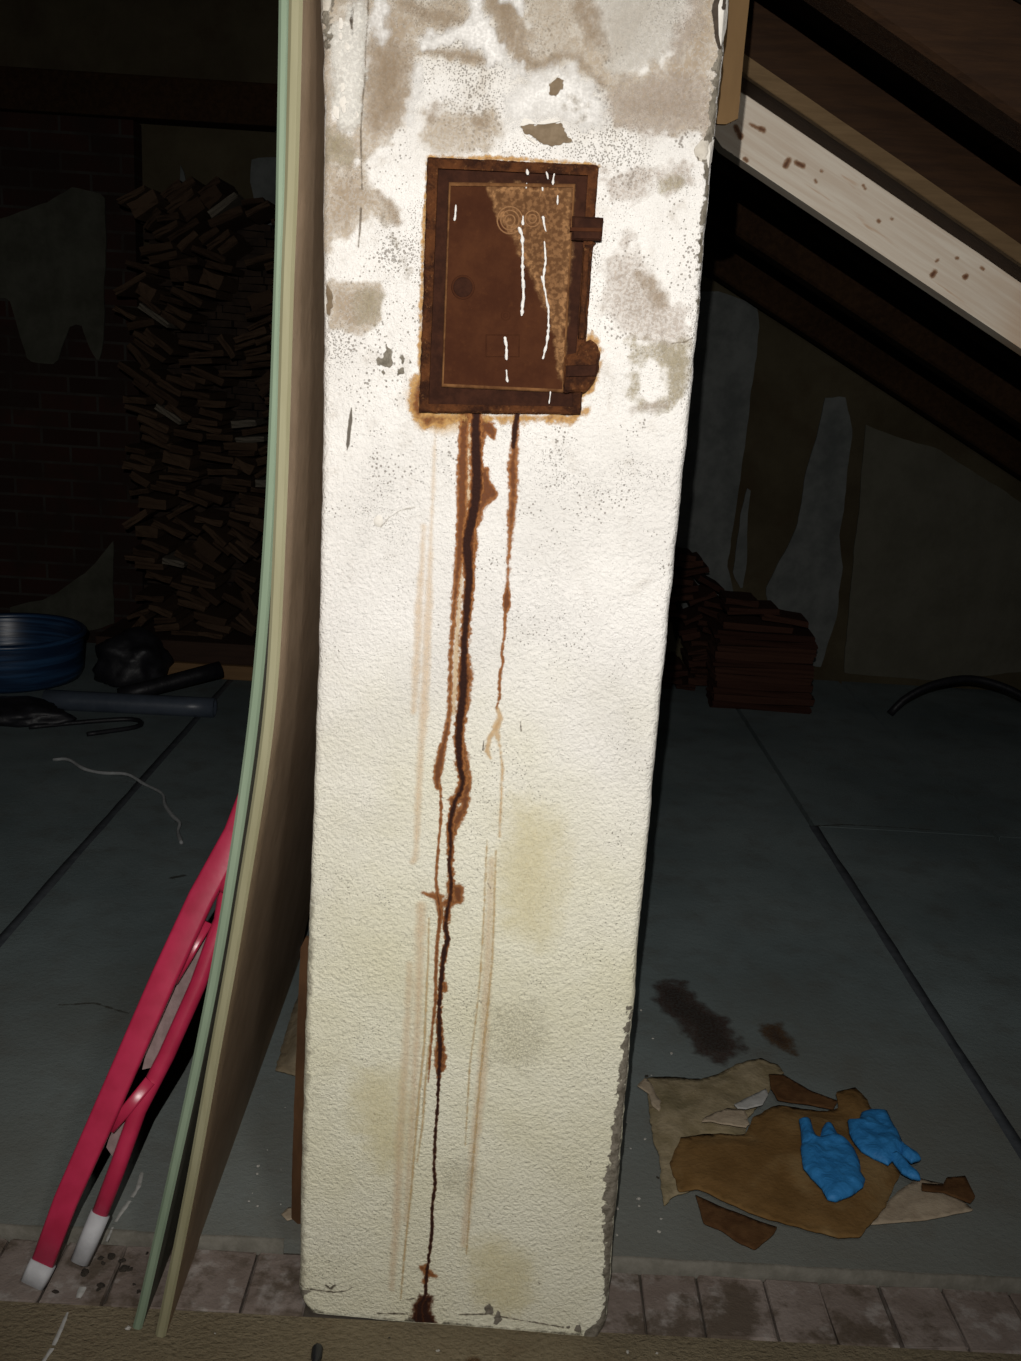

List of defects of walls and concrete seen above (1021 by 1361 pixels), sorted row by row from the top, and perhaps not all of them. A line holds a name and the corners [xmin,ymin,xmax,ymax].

water stain [323,0,719,253]
spalling [520,118,572,146]
spalling [549,75,564,96]
water stain [327,281,382,334]
water stain [609,257,691,410]
corrosion [401,155,601,1324]